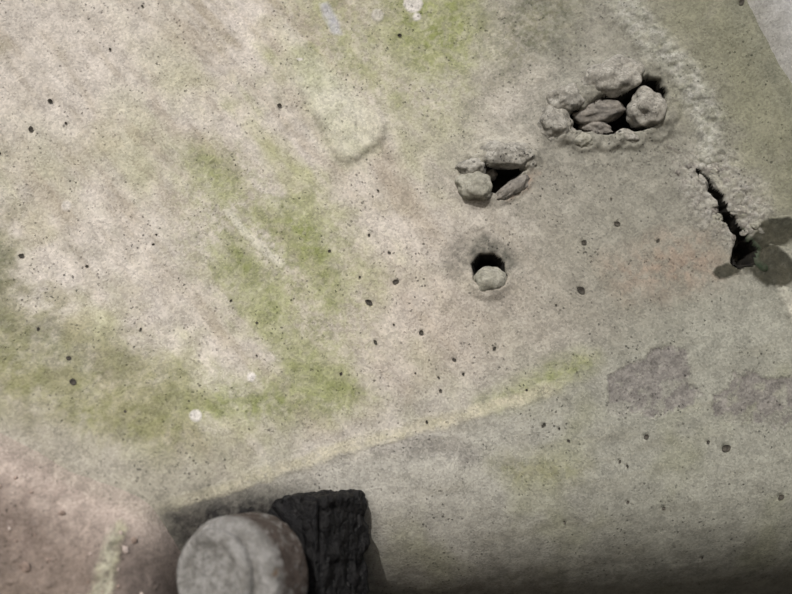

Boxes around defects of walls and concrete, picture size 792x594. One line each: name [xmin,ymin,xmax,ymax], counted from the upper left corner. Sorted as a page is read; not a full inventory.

spalling [537,54,667,148]
spalling [455,140,537,201]
crack [664,142,746,251]
water stain [0,218,140,384]
spalling [464,226,526,292]
water stain [712,215,792,290]